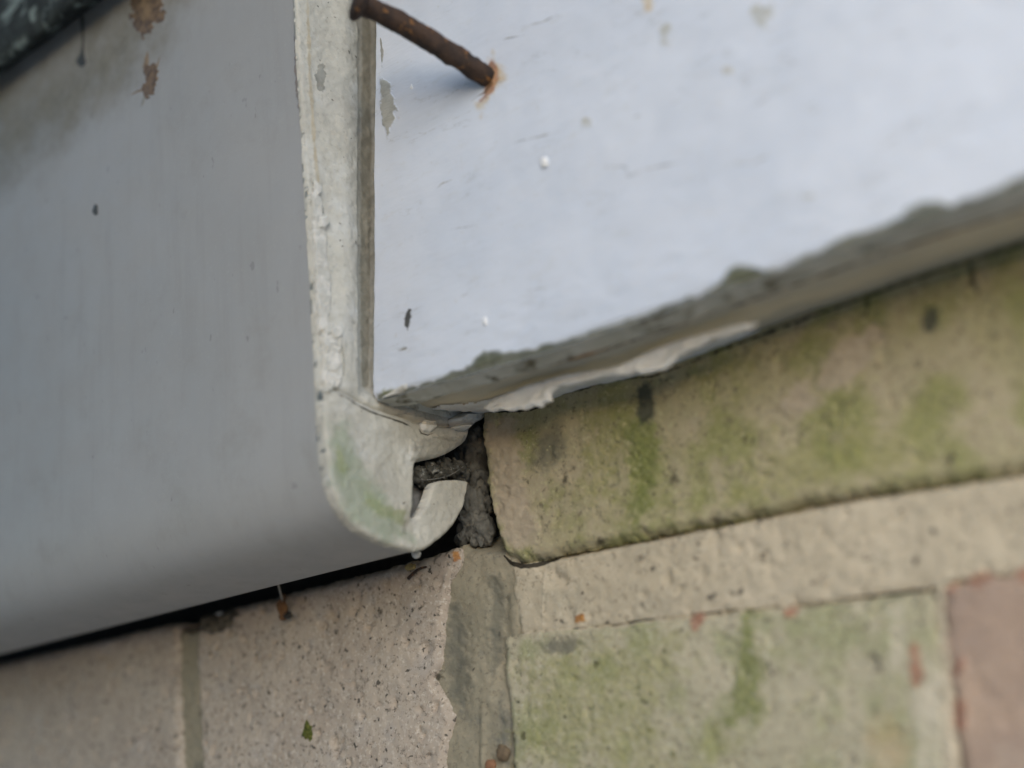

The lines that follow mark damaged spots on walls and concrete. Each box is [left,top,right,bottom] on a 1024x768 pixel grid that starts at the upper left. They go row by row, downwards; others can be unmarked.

peeling [378,37,399,137]
corrosion [469,44,510,122]
peeling [409,323,760,549]
damp [564,390,632,523]
damp [872,595,920,681]
damp [907,659,957,768]